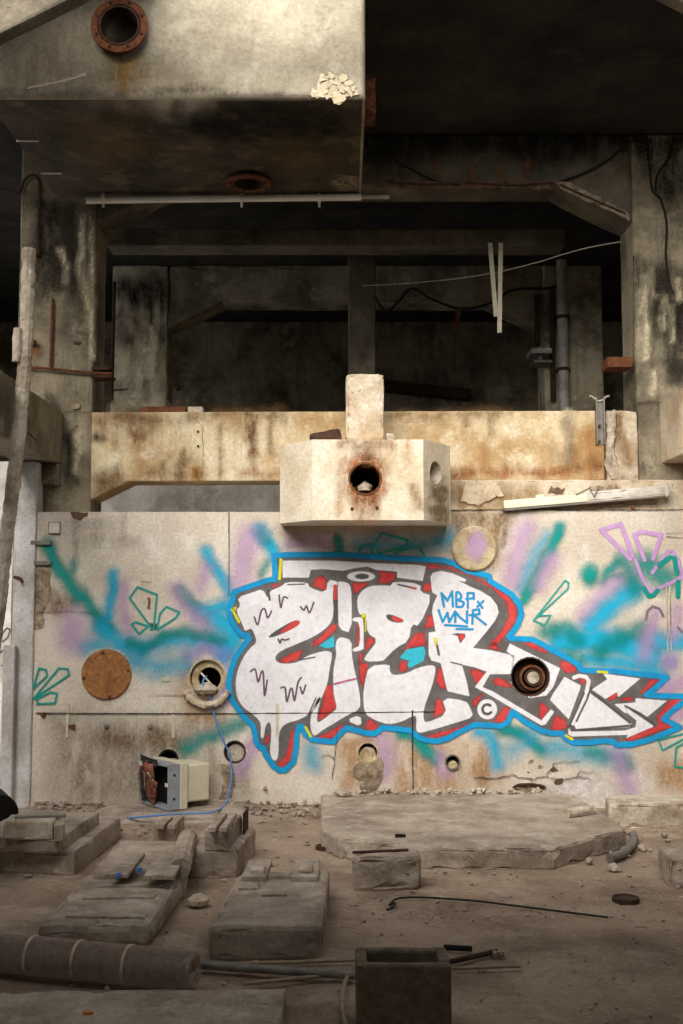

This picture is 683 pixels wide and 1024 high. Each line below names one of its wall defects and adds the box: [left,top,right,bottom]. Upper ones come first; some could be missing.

water stain [636,263,683,384]
rust [126,406,187,441]
crack [475,760,593,783]